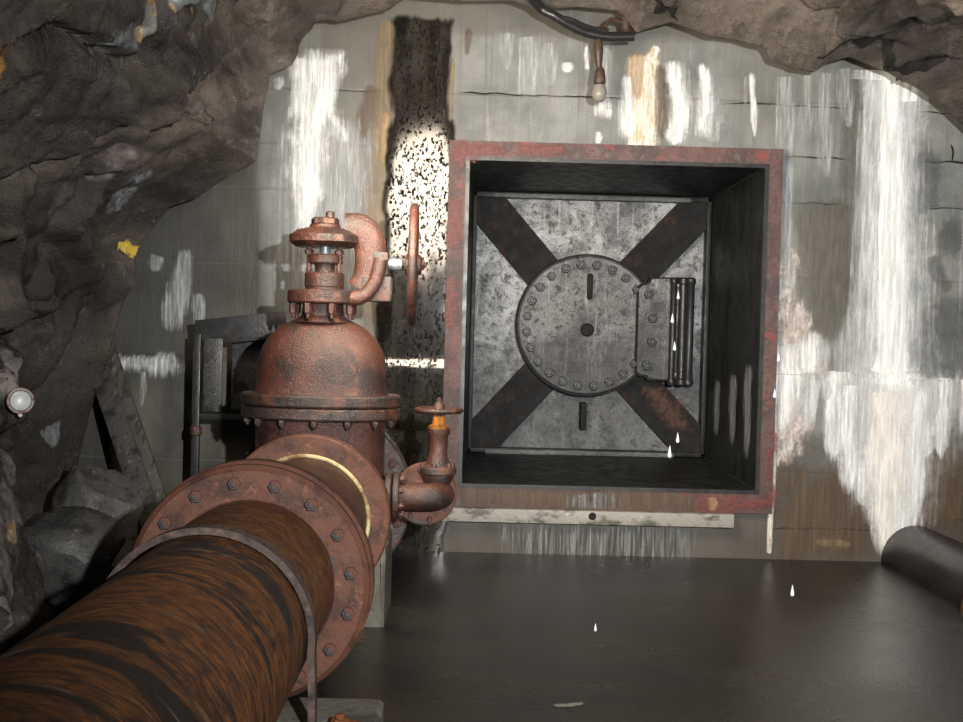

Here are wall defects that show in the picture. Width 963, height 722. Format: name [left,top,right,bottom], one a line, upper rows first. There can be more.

leakage [519,37,572,88]
leakage [596,46,720,146]
rust [656,66,668,133]
leakage [282,52,365,230]
leakage [376,16,455,467]
leakage [166,254,187,324]
leakage [767,68,963,554]
leakage [121,356,176,397]
leakage [395,521,448,552]